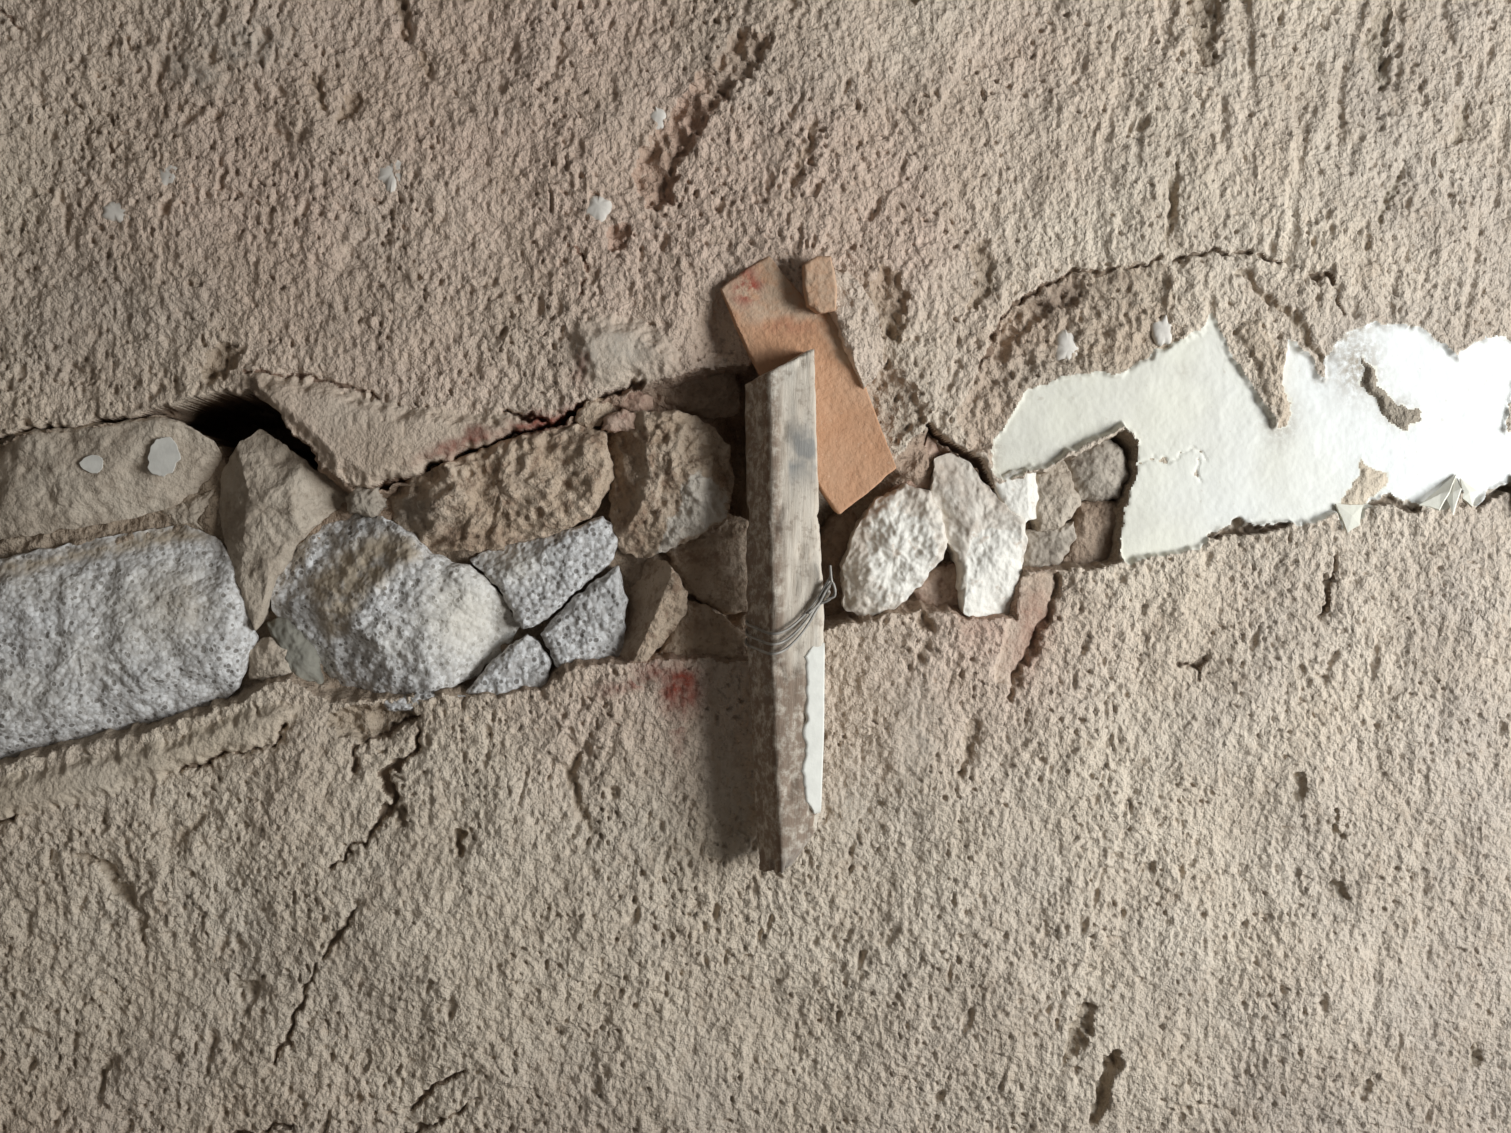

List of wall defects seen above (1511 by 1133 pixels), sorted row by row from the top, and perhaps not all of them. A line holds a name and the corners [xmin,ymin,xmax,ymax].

spalling [201,342,244,381]
crack [974,247,1344,384]
peeling [956,163,1511,565]
crack [0,361,759,559]
crack [817,423,1203,703]
spalling [327,702,417,744]
crack [0,492,748,869]
spalling [564,750,594,839]
spalling [916,609,935,663]
spalling [956,719,981,780]
crack [274,908,357,1064]